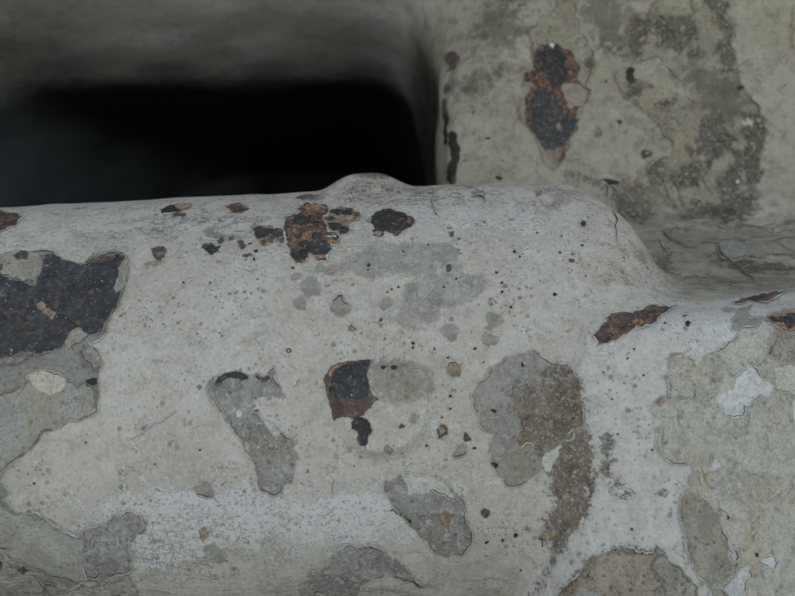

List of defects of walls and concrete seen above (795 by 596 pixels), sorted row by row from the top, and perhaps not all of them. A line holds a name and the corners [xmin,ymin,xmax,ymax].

rust [516,0,596,170]
peeling [605,0,795,263]
rust [0,210,24,231]
rust [202,194,415,264]
rust [593,304,678,347]
rust [733,290,787,304]
rust [767,309,795,334]
peeling [0,249,146,596]
peeling [205,365,299,498]
peeling [556,305,795,596]
peeling [383,471,474,559]
peeling [297,543,424,596]